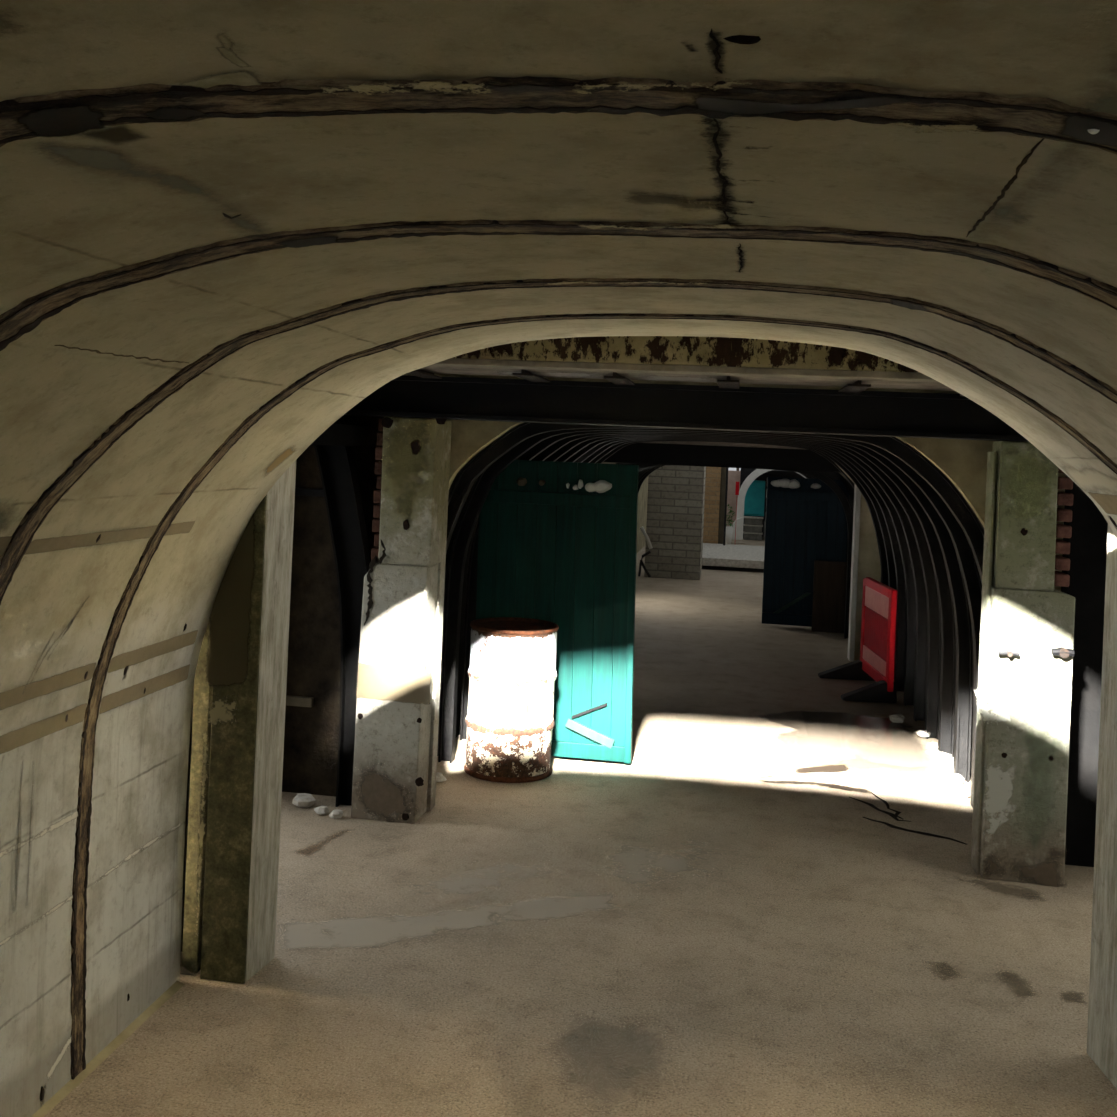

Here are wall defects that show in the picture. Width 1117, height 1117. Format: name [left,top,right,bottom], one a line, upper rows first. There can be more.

crack [683,29,724,74]
crack [696,118,773,272]
crack [966,138,1045,237]
flaking render [371,419,383,561]
peeling [975,689,1017,723]
leakage [762,755,944,793]
peeling [983,765,1017,838]